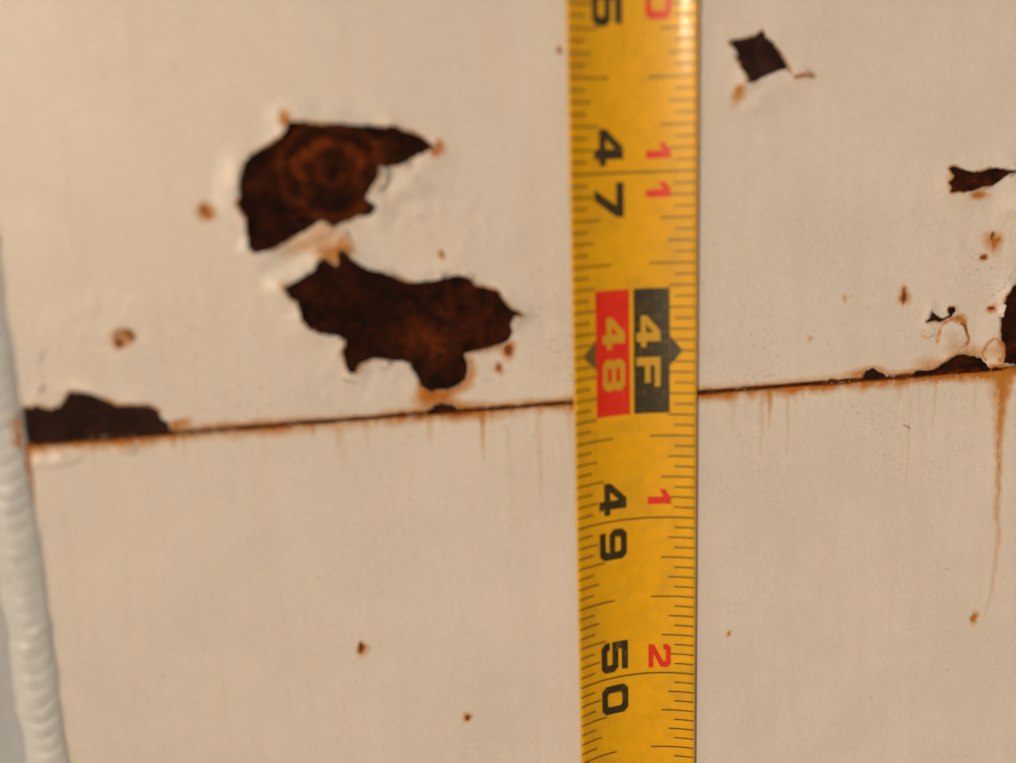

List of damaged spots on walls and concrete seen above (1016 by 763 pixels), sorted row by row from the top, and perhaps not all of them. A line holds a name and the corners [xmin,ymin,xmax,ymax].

rust [199,204,213,220]
rust [113,330,134,348]
rust [496,344,513,373]
rust [696,365,1016,469]
rust [15,398,574,487]